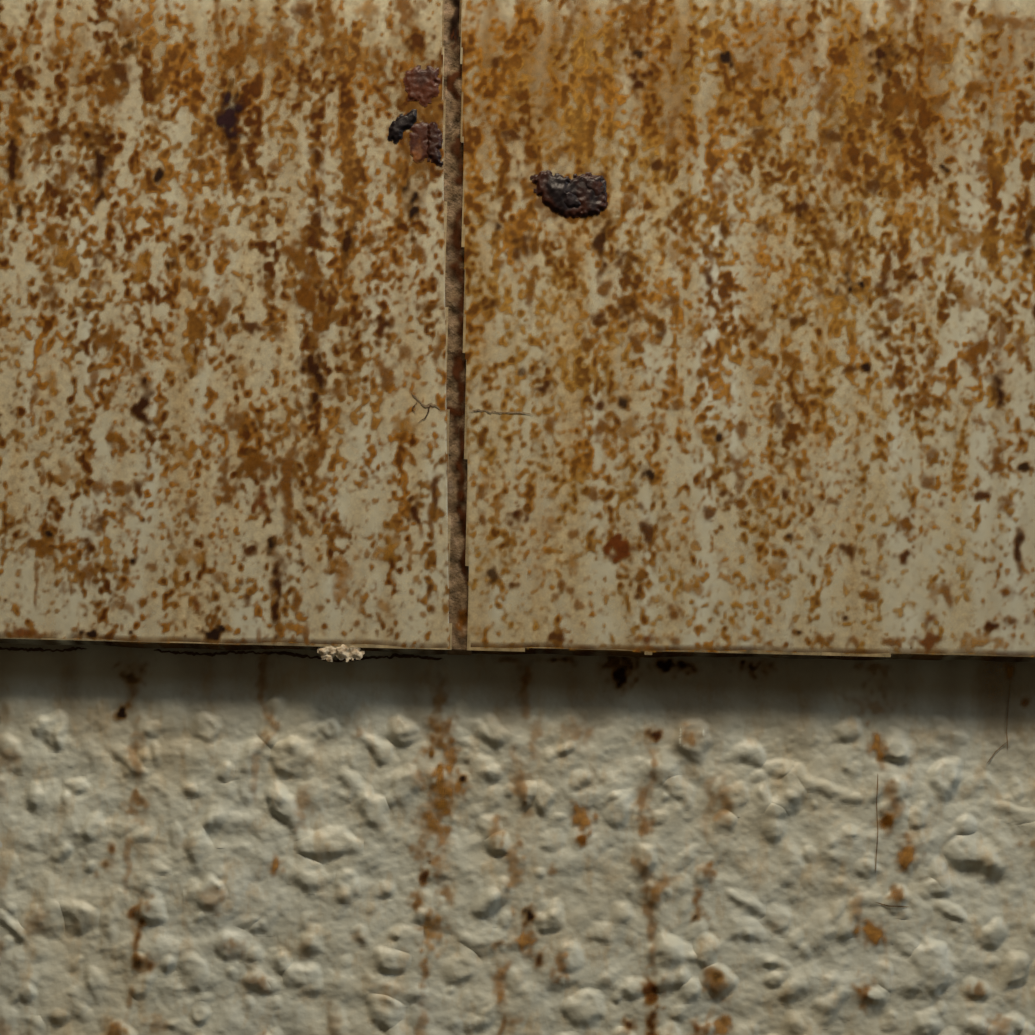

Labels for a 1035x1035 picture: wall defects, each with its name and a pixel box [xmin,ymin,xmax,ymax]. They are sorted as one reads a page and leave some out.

water stain [0,0,137,108]
water stain [202,0,444,106]
water stain [460,0,517,107]
water stain [594,34,665,132]
water stain [678,0,753,16]
water stain [826,0,1035,115]
corrosion [0,0,1035,689]
crack [412,393,440,423]
corrosion [424,719,467,843]
corrosion [515,775,527,803]
corrosion [412,870,442,978]
corrosion [517,907,542,966]